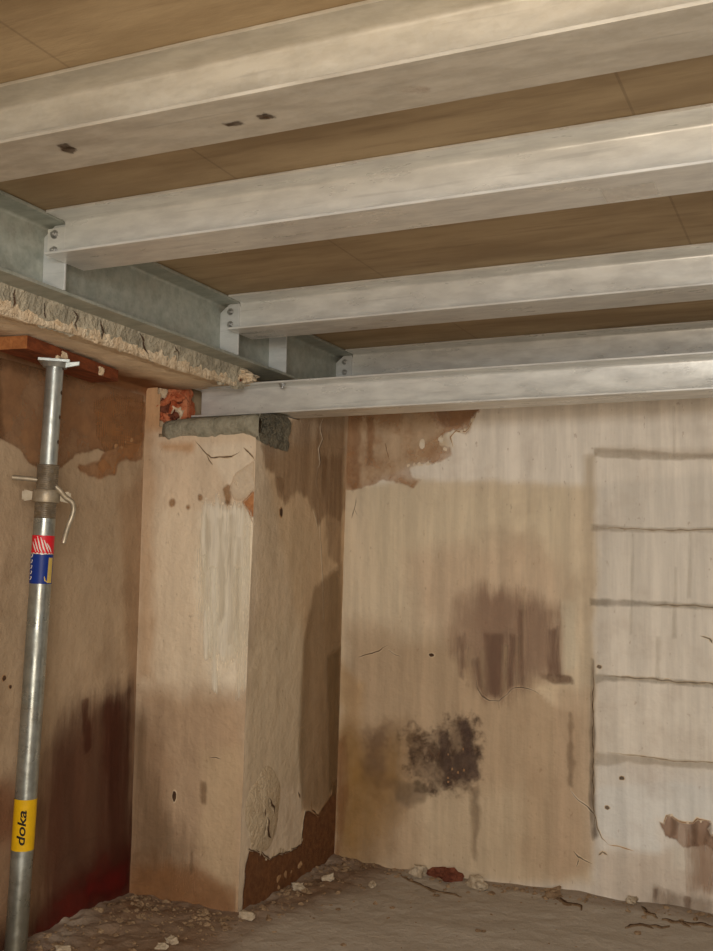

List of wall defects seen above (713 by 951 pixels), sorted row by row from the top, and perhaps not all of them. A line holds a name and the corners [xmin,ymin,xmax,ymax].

spalling [0,299,260,423]
peeling [352,413,402,431]
peeling [407,409,479,467]
leakage [480,594,550,694]
leakage [46,702,128,918]
spalling [238,780,337,921]